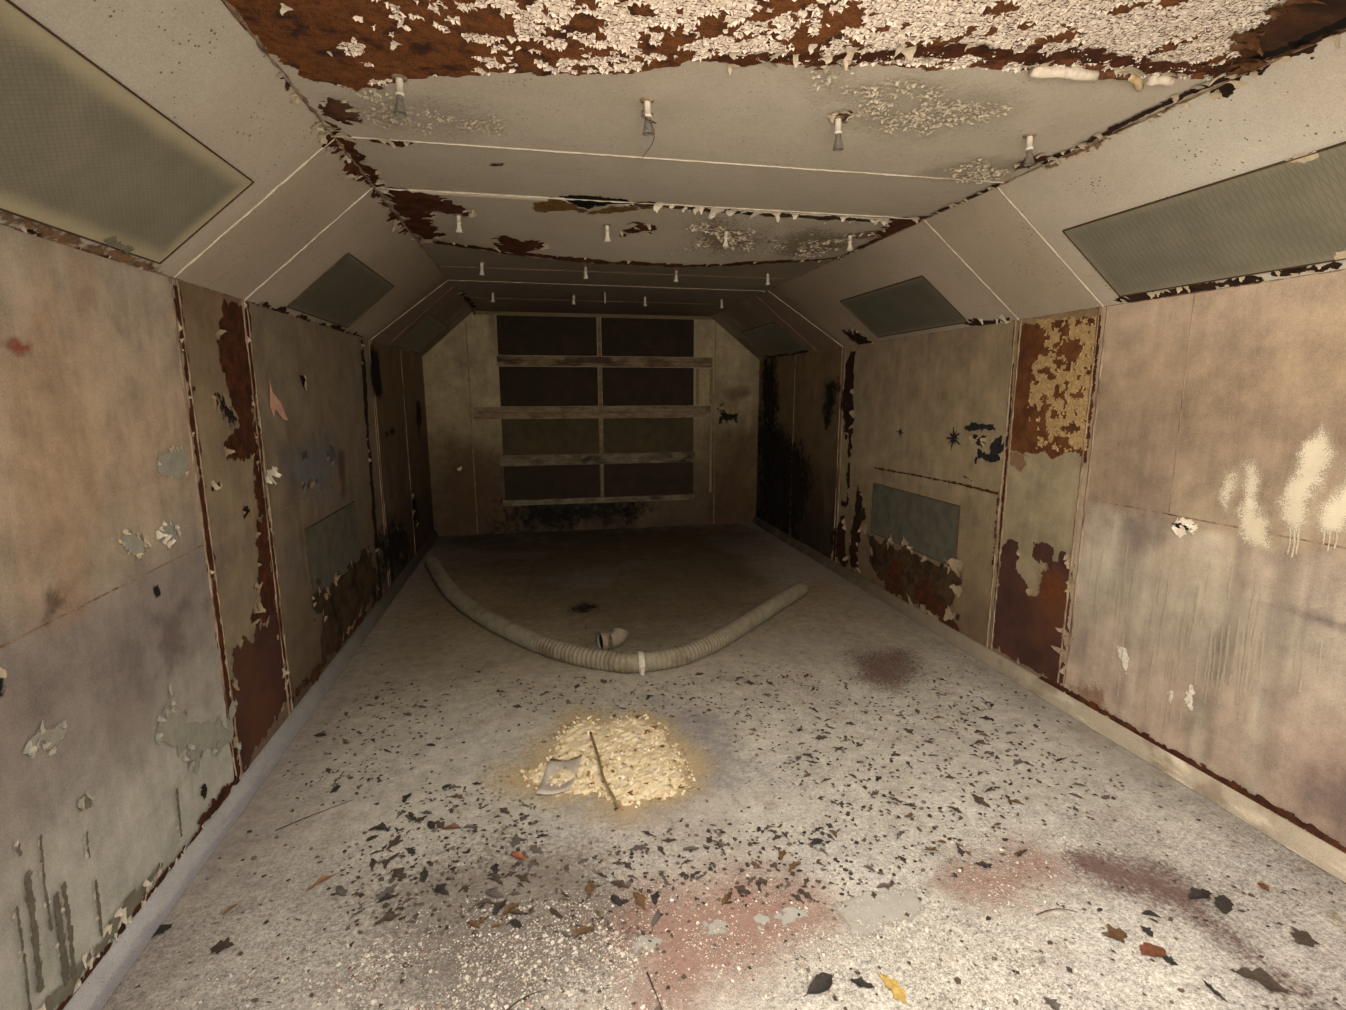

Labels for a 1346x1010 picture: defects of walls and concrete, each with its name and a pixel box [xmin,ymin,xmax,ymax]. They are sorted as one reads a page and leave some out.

peeling [221,0,1330,137]
peeling [313,118,409,235]
peeling [629,201,892,259]
peeling [964,314,1098,464]
peeling [243,506,277,630]
peeling [992,539,1075,684]
damp [1287,526,1300,558]
peeling [1167,684,1195,711]
damp [175,788,183,837]
damp [11,834,77,1010]
damp [93,879,103,936]
peeling [154,835,1139,1010]